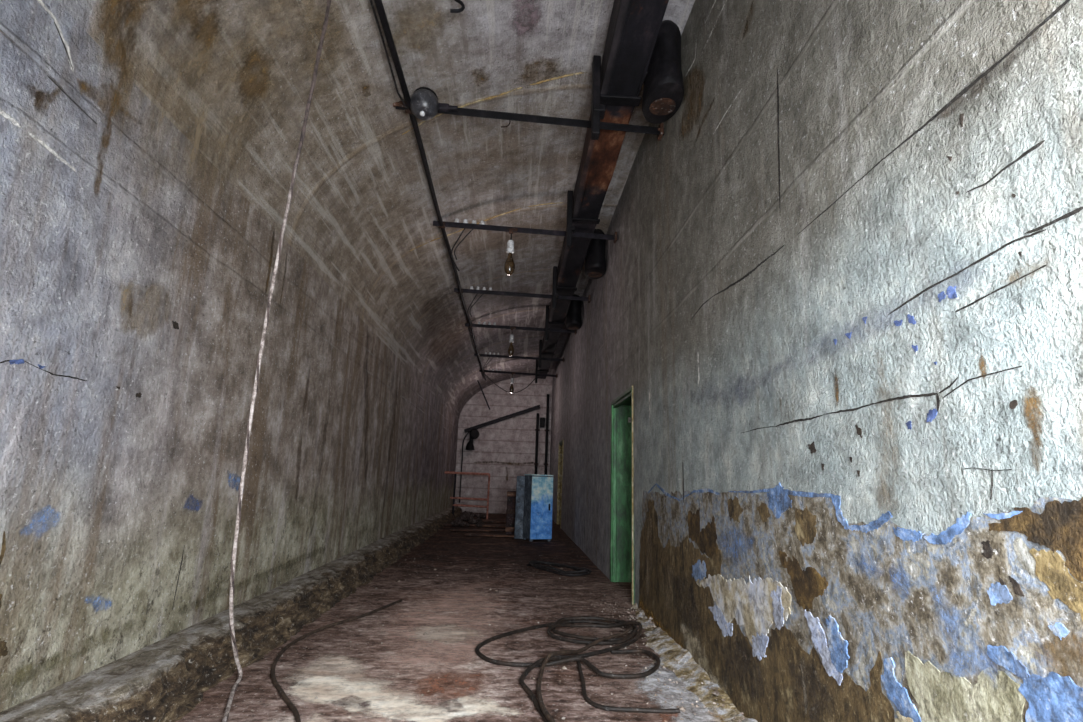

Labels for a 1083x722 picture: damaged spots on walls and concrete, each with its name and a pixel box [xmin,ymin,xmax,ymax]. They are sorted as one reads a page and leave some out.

leakage [100,0,289,187]
crack [691,0,1083,320]
crack [742,366,1022,433]
flaking render [0,638,9,658]
peeling [637,482,1083,722]